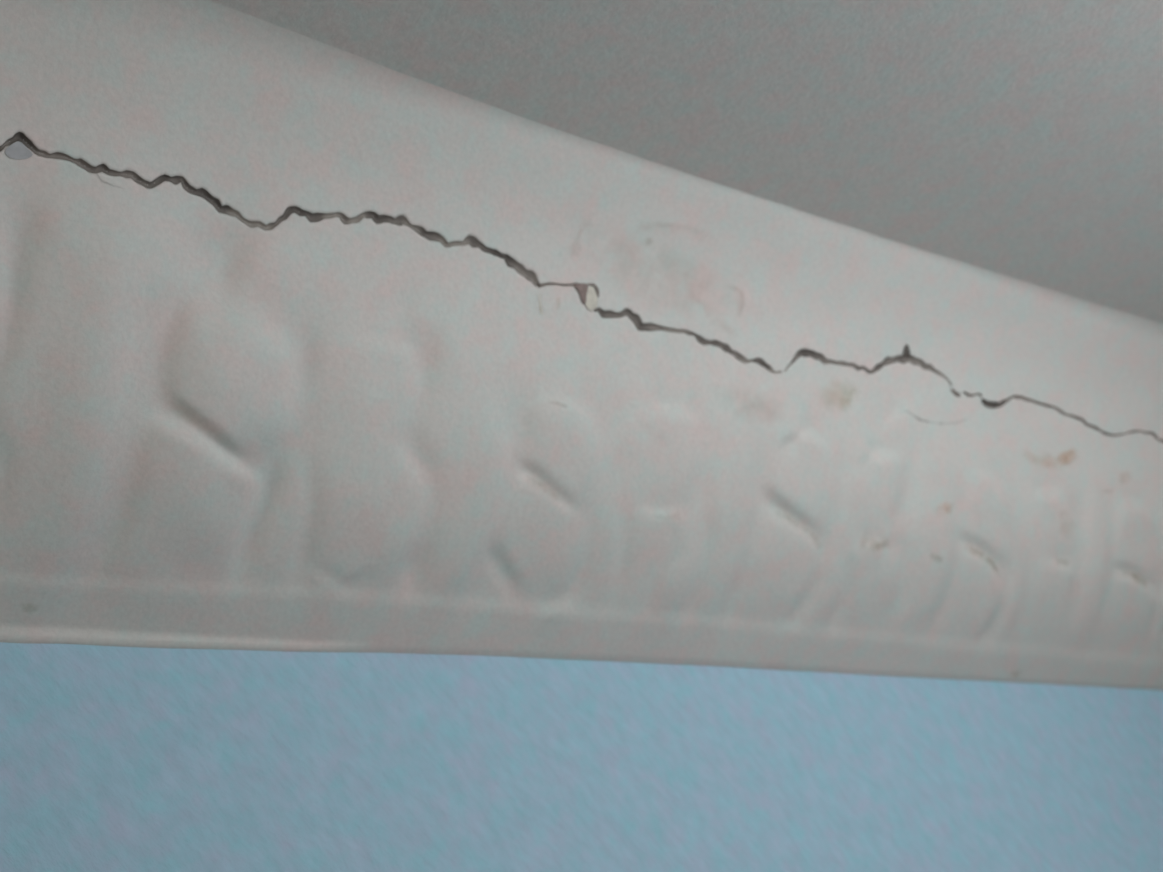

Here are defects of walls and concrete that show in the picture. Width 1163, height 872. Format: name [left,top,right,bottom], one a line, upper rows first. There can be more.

crack [0,132,578,288]
crack [593,308,1163,442]